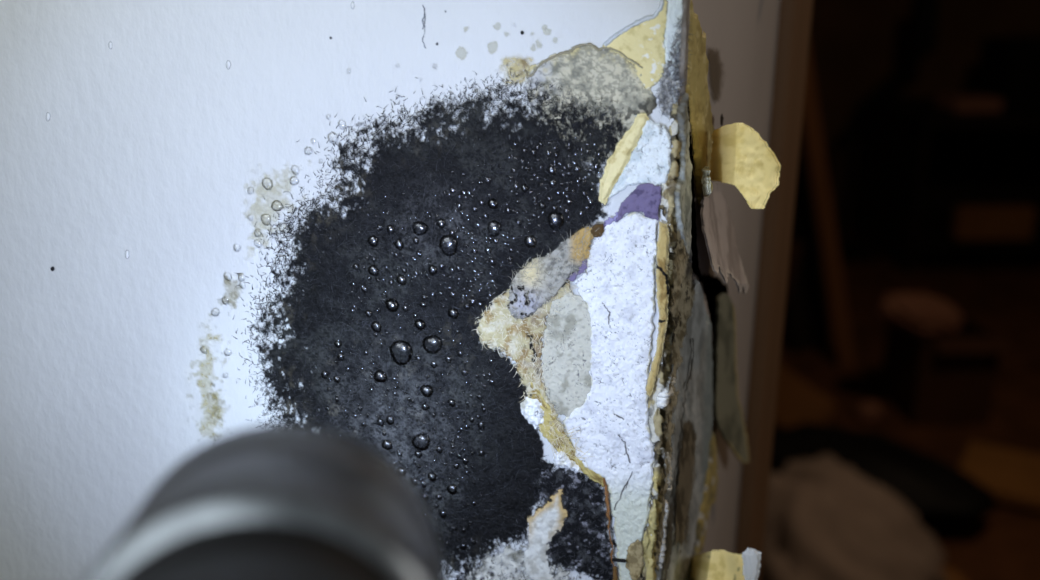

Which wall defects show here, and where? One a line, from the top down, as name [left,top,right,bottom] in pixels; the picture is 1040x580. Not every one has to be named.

water stain [225,17,697,580]
flaking render [521,489,567,580]
flaking render [541,0,781,580]